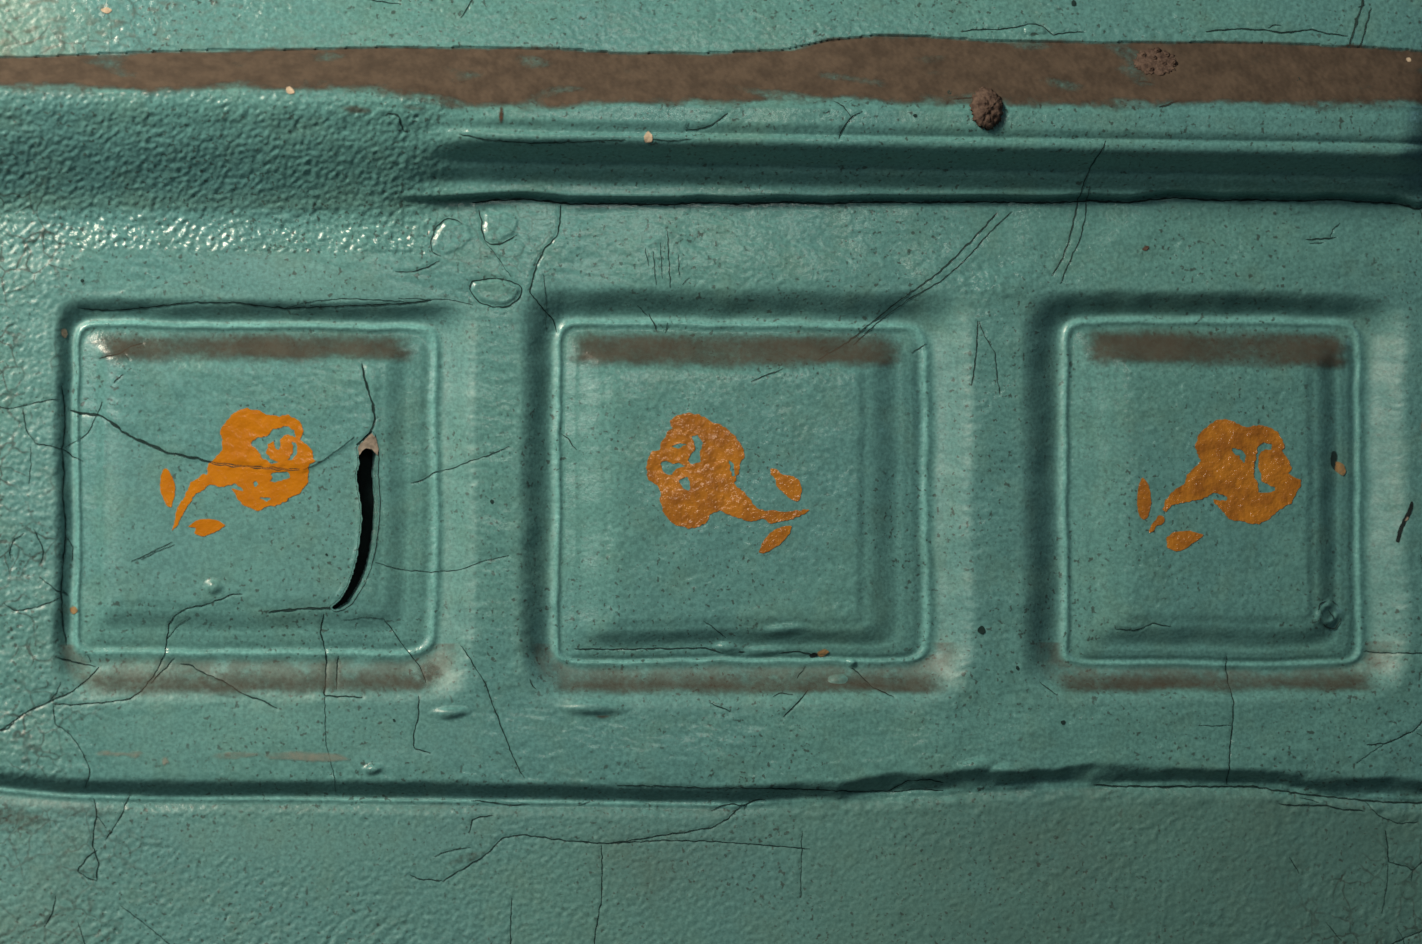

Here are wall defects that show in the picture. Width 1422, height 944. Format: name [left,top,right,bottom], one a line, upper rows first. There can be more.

crack [0,363,509,944]
crack [1366,648,1422,656]
crack [1095,658,1422,944]